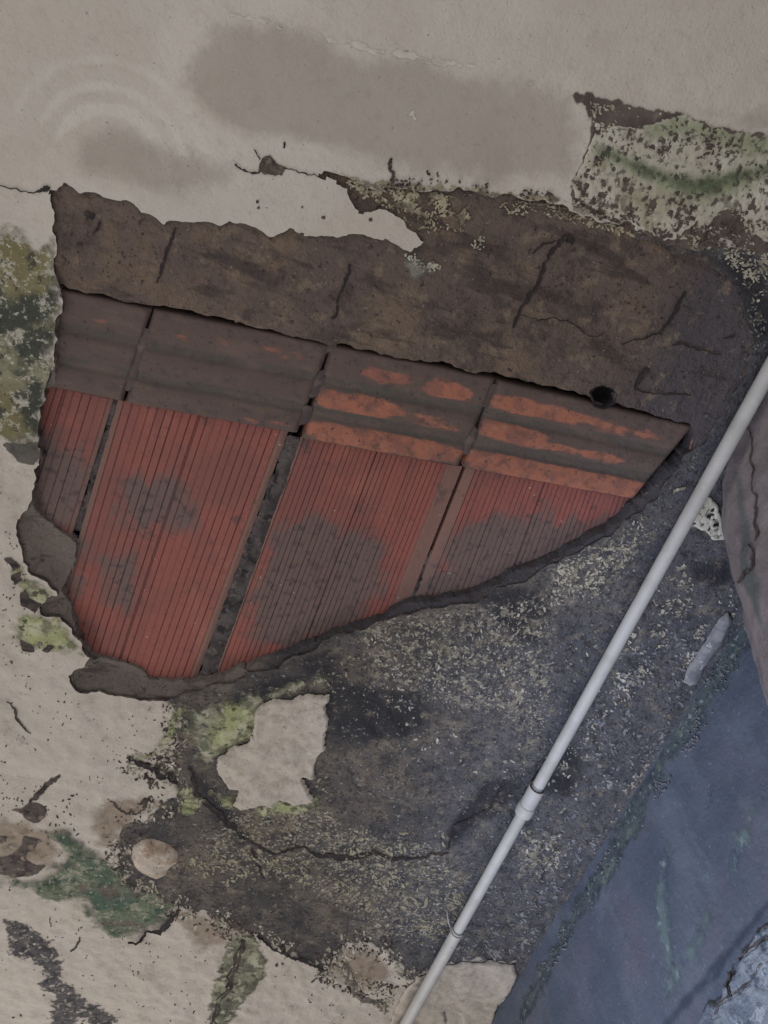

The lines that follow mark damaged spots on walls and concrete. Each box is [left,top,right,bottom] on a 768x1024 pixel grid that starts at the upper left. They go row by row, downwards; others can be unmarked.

crack [0,185,50,194]
crack [387,158,395,190]
water stain [0,230,61,443]
crack [156,228,176,283]
crack [331,264,351,320]
crack [512,235,736,355]
spalling [3,92,768,702]
crack [737,427,759,584]
water stain [99,219,768,1024]
water stain [9,776,103,857]
crack [110,757,506,879]